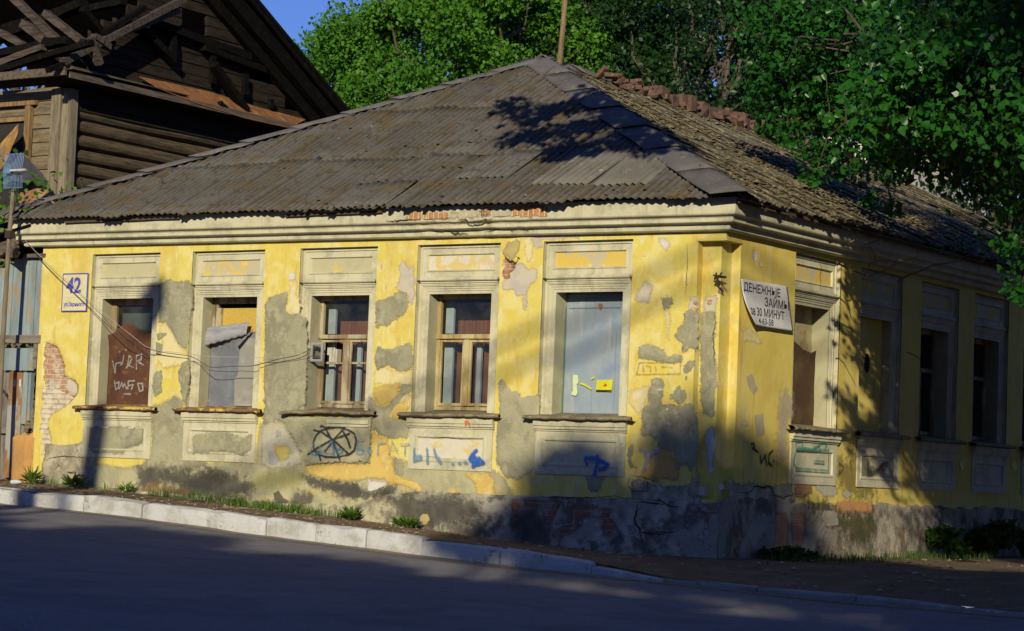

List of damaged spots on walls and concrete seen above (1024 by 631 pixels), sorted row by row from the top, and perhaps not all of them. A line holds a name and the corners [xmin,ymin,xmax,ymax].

flaking render [405,205,547,221]
peeling [285,272,301,315]
peeling [502,235,580,311]
peeling [688,286,724,312]
peeling [156,323,188,369]
spalling [39,342,95,487]
crack [521,475,679,543]